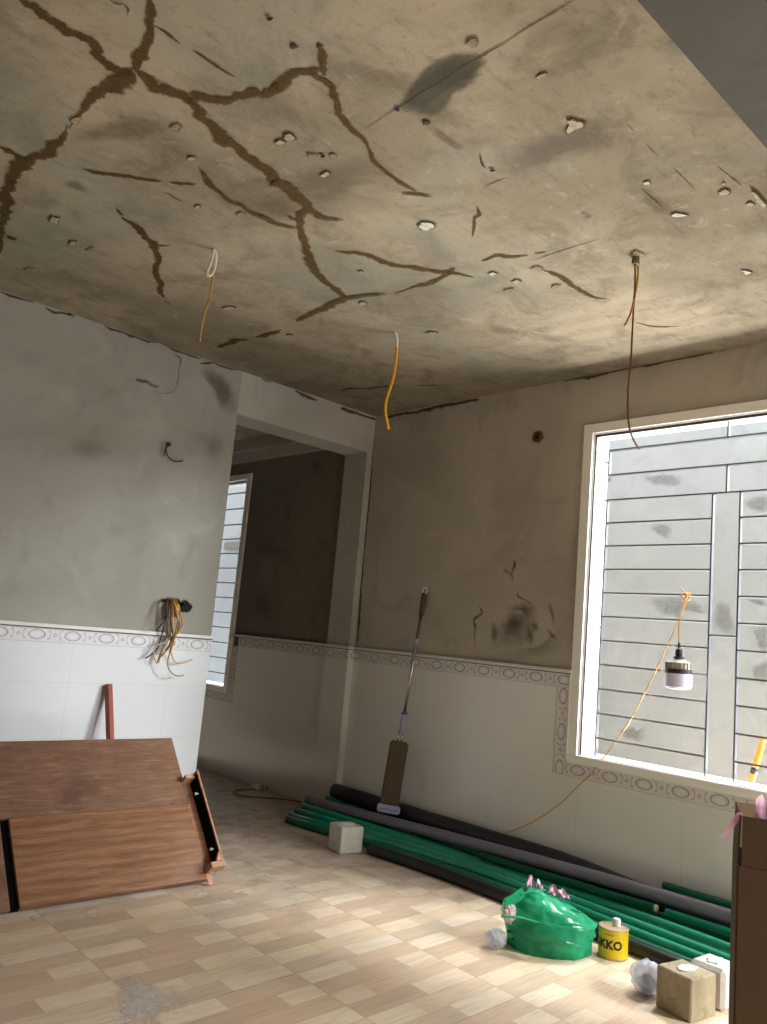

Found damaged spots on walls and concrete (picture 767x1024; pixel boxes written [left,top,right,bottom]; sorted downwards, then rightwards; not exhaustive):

water stain [404,55,480,113]
spalling [565,117,586,134]
spalling [274,132,297,145]
crack [0,0,603,387]
spalling [417,220,436,230]
crack [295,390,317,401]